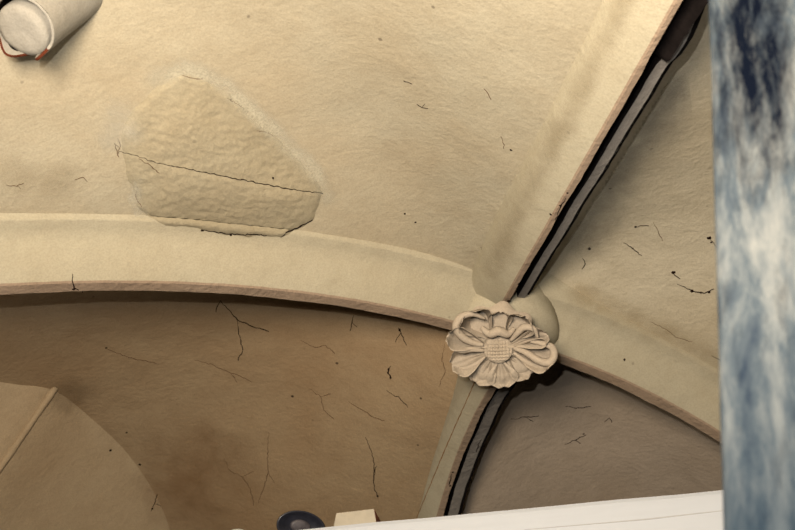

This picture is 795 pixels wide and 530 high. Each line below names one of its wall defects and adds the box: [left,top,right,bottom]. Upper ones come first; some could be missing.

crack [671,271,713,294]
crack [194,300,269,382]
crack [416,382,475,518]